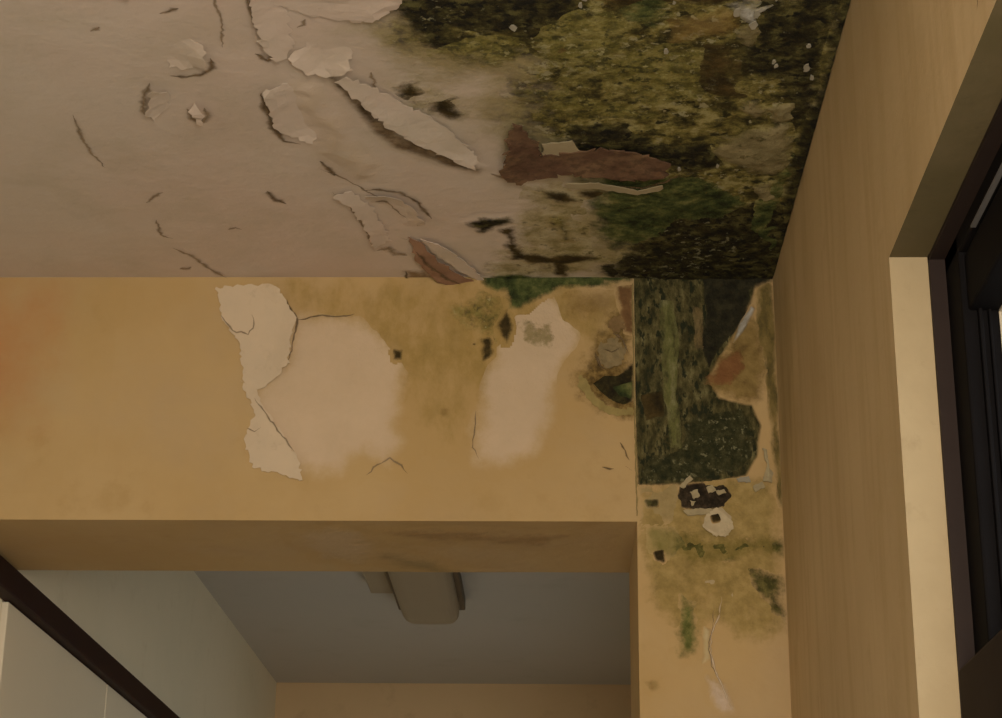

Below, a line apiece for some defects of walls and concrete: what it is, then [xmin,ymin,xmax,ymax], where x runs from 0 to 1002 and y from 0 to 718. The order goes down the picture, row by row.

crack [246,0,432,256]
peeling [315,73,682,195]
spalling [215,283,420,491]
peeling [390,237,484,285]
spalling [456,297,580,482]
damp [240,0,851,667]
spalling [702,302,768,414]
spalling [637,476,734,537]